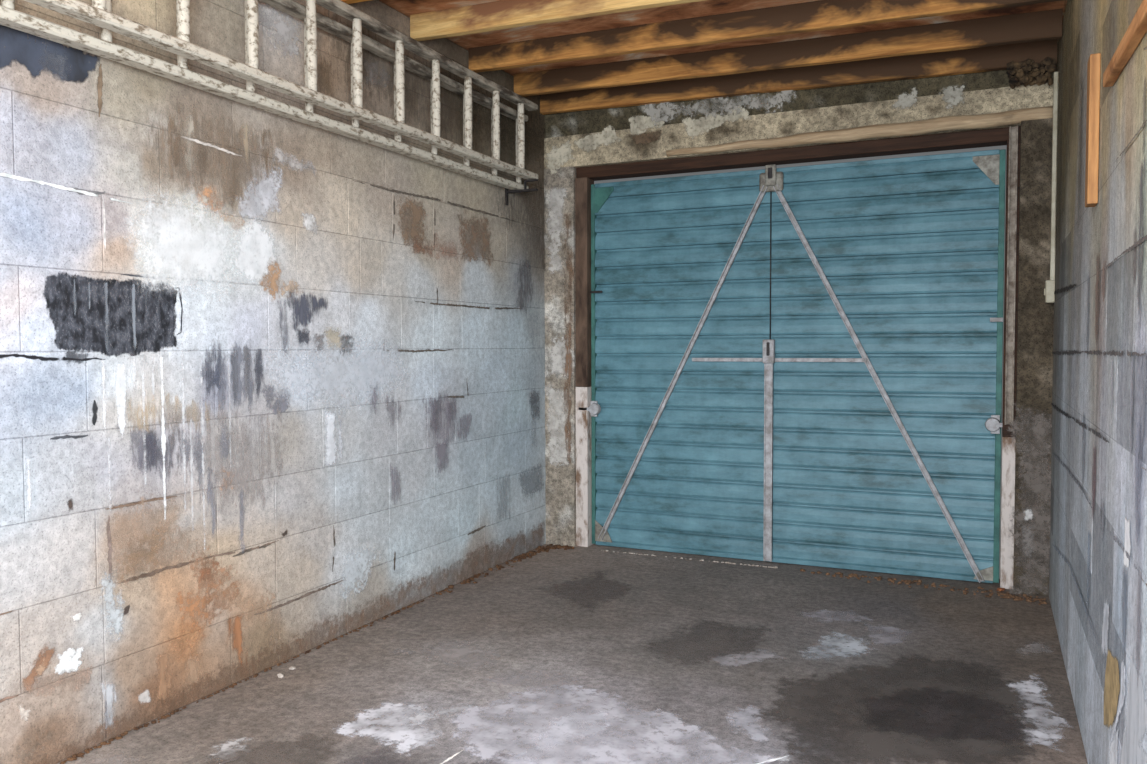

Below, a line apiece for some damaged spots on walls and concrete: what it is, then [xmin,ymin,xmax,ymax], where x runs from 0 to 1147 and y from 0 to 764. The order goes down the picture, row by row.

crack [0,353,105,361]
water stain [131,406,174,468]
water stain [187,345,265,547]
rust [158,548,275,699]
water stain [337,671,785,764]